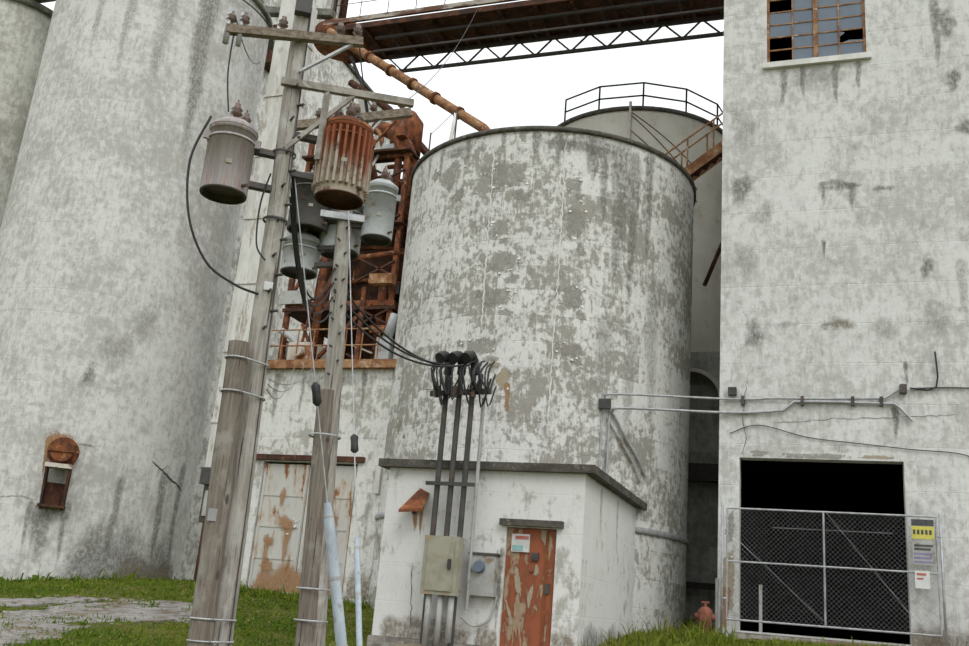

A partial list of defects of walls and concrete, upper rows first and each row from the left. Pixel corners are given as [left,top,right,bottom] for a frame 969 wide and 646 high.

crack [152,461,182,491]
rust [252,488,301,593]
peeling [506,565,539,625]